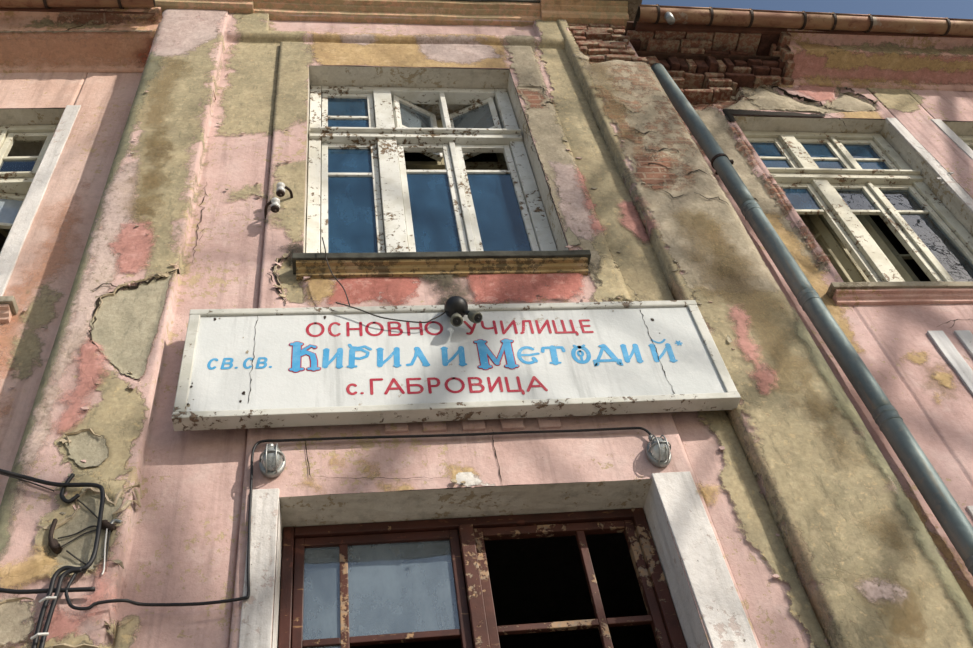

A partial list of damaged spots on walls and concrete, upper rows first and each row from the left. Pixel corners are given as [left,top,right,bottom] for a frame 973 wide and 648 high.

peeling [7,285,63,388]
flaking render [84,529,124,616]
peeling [19,8,228,526]
crack [89,182,207,347]
peeling [216,12,973,648]
damp [794,308,973,636]